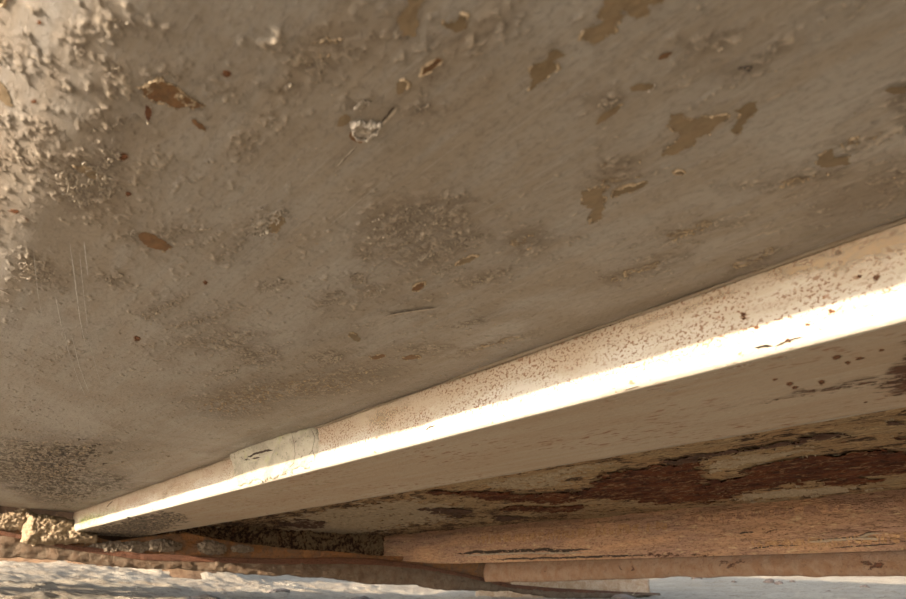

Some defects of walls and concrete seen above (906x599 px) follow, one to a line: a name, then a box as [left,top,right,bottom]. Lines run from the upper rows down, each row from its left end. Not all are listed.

peeling [577,0,663,46]
peeling [526,50,565,91]
peeling [135,76,206,132]
peeling [337,114,383,144]
peeling [661,101,758,157]
peeling [814,149,851,168]
peeling [580,181,648,225]
peeling [138,232,173,253]
rust [765,355,906,404]
rust [418,432,906,522]